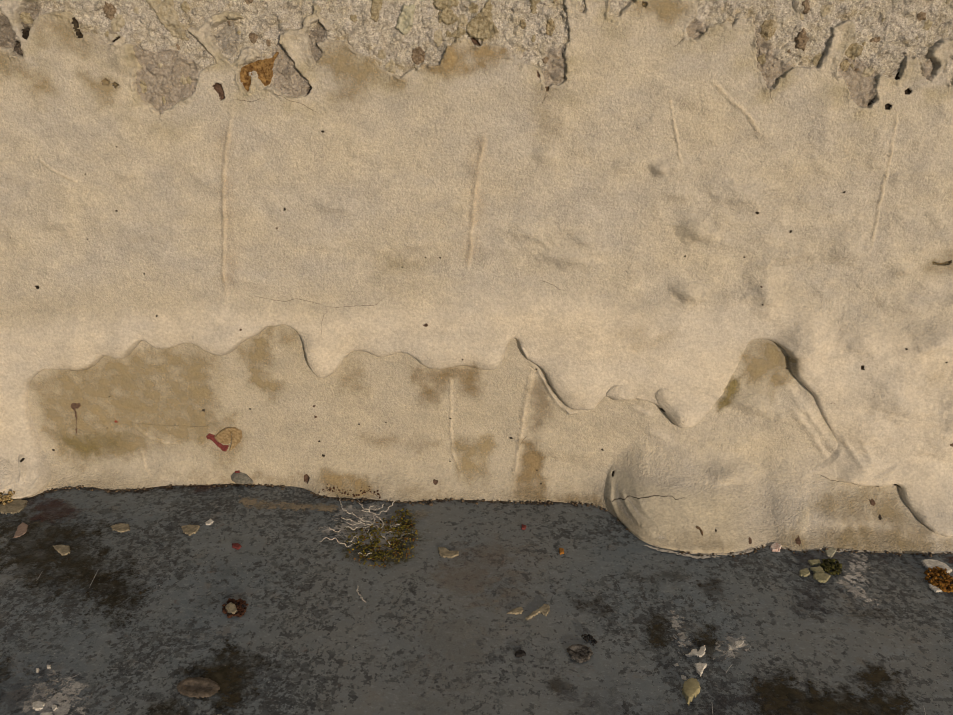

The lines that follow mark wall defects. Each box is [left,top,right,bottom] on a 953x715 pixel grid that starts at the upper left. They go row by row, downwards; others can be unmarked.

peeling [103,2,125,37]
spalling [227,21,279,92]
peeling [370,0,383,22]
peeling [411,46,425,65]
peeling [433,0,499,41]
peeling [520,0,555,54]
peeling [787,28,823,66]
peeling [802,0,831,17]
peeling [840,36,881,78]
peeling [915,11,933,41]
leakage [47,351,211,455]
leakage [517,442,545,499]